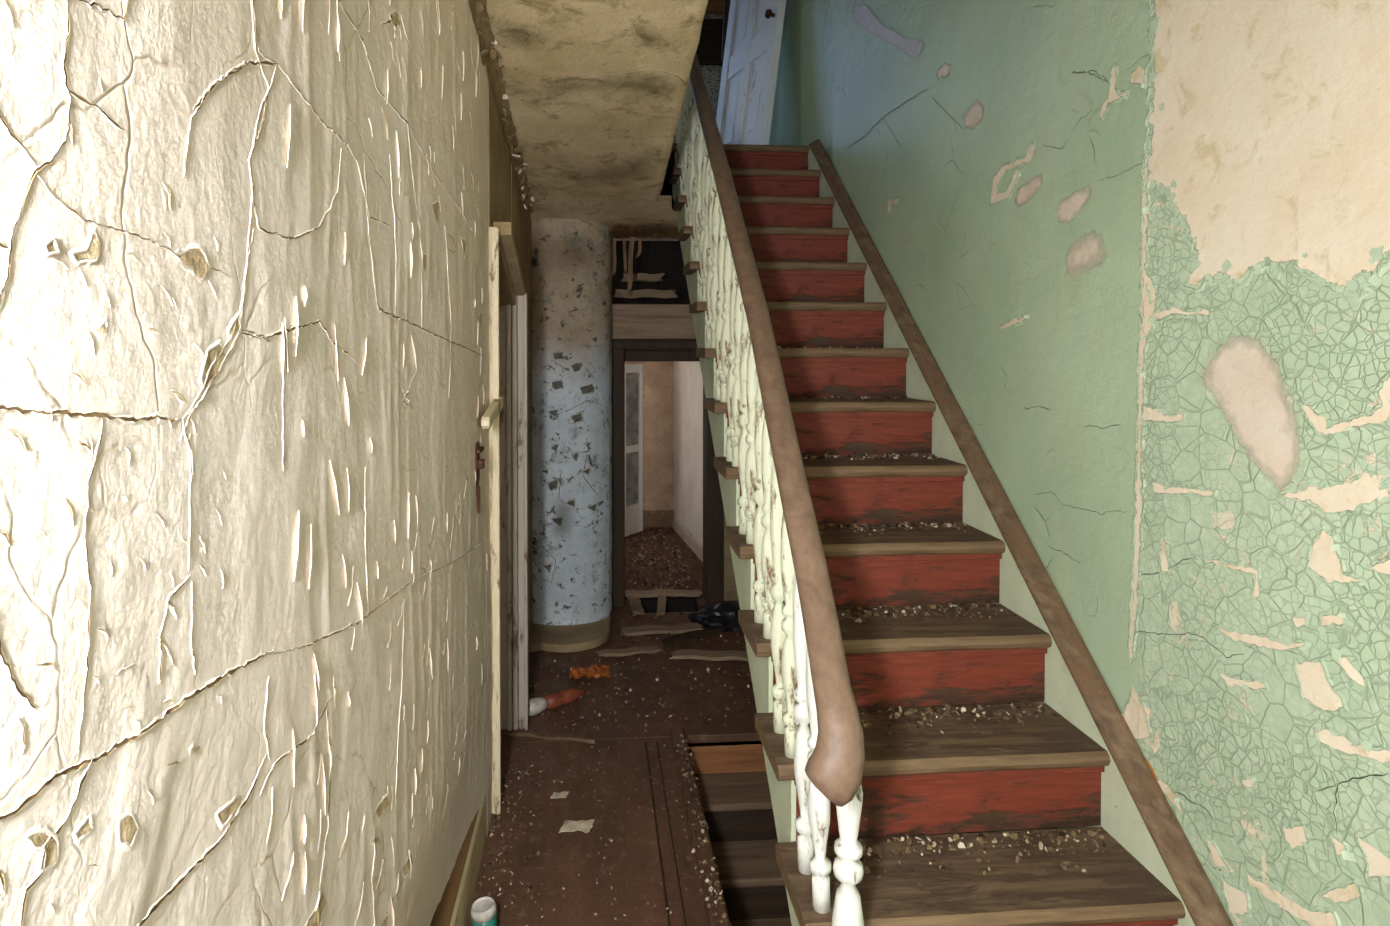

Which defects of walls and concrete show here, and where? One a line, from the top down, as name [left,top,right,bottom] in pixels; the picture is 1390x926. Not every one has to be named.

crack [849,88,964,149]
spalling [164,232,218,298]
spalling [191,313,242,393]
peeling [1098,0,1390,663]
crack [0,0,486,926]
crack [1141,556,1207,575]
crack [1134,630,1244,658]
peeling [1210,608,1390,769]
spalling [22,812,95,875]
crack [1171,787,1230,871]
peeling [1205,820,1390,926]
crack [1309,773,1389,834]